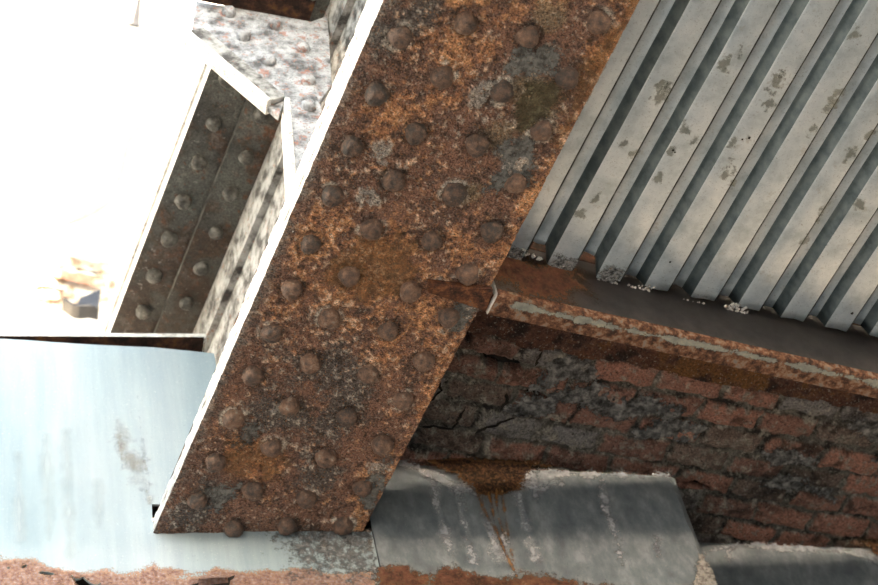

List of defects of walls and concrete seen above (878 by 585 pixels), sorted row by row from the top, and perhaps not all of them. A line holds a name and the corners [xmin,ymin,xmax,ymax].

crack [430,382,443,402]
crack [421,393,514,434]
corrosion [467,247,878,414]
corrosion [0,457,614,585]